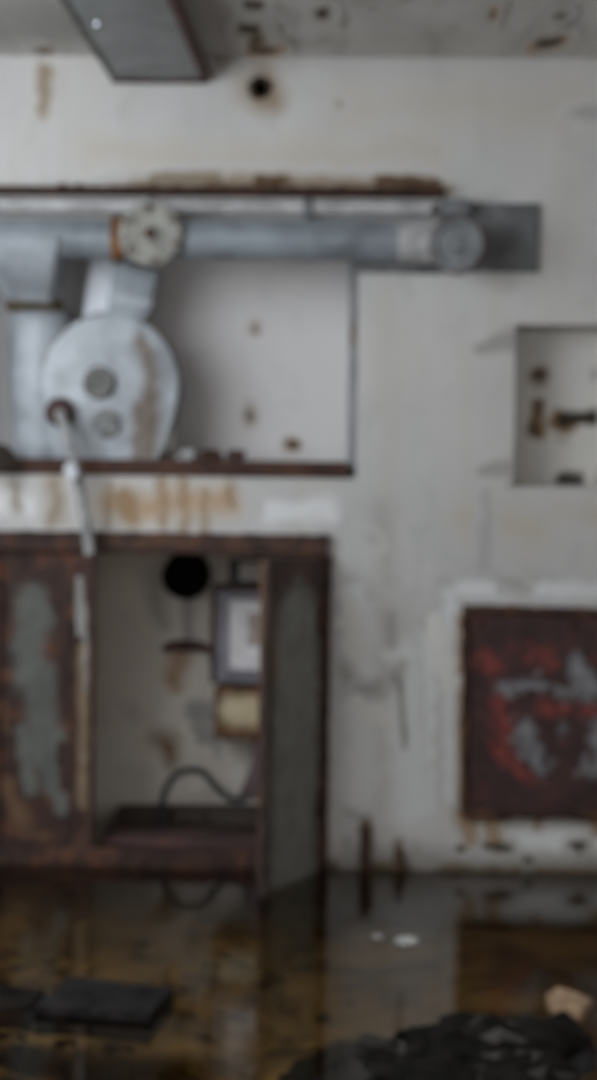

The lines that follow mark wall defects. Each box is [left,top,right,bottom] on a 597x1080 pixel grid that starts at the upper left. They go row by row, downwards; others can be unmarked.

corrosion [100,158,462,210]
corrosion [518,393,554,449]
corrosion [12,475,265,534]